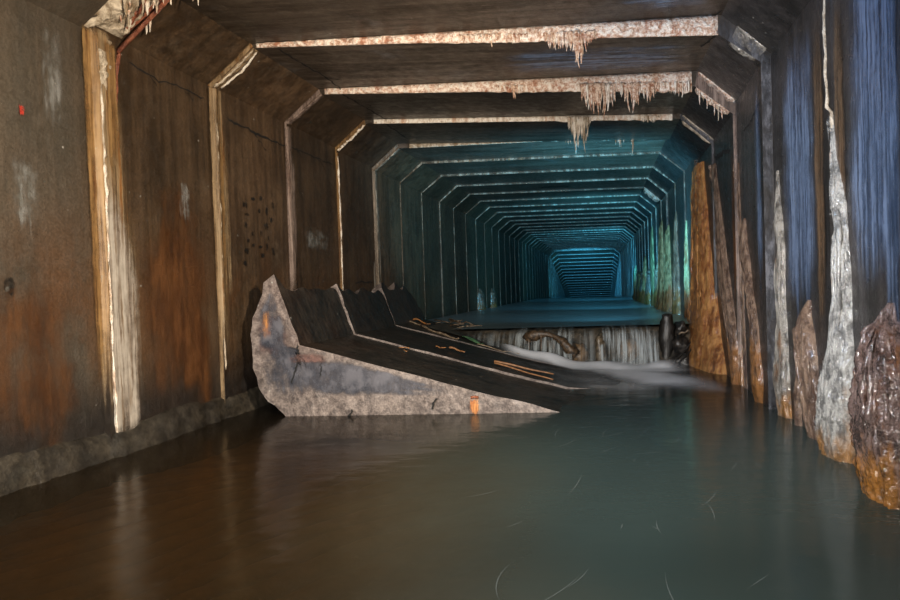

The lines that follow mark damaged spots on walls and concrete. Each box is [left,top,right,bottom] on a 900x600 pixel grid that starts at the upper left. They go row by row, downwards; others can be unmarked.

crack [227,117,333,170]
water stain [695,72,737,179]
water stain [82,0,172,433]